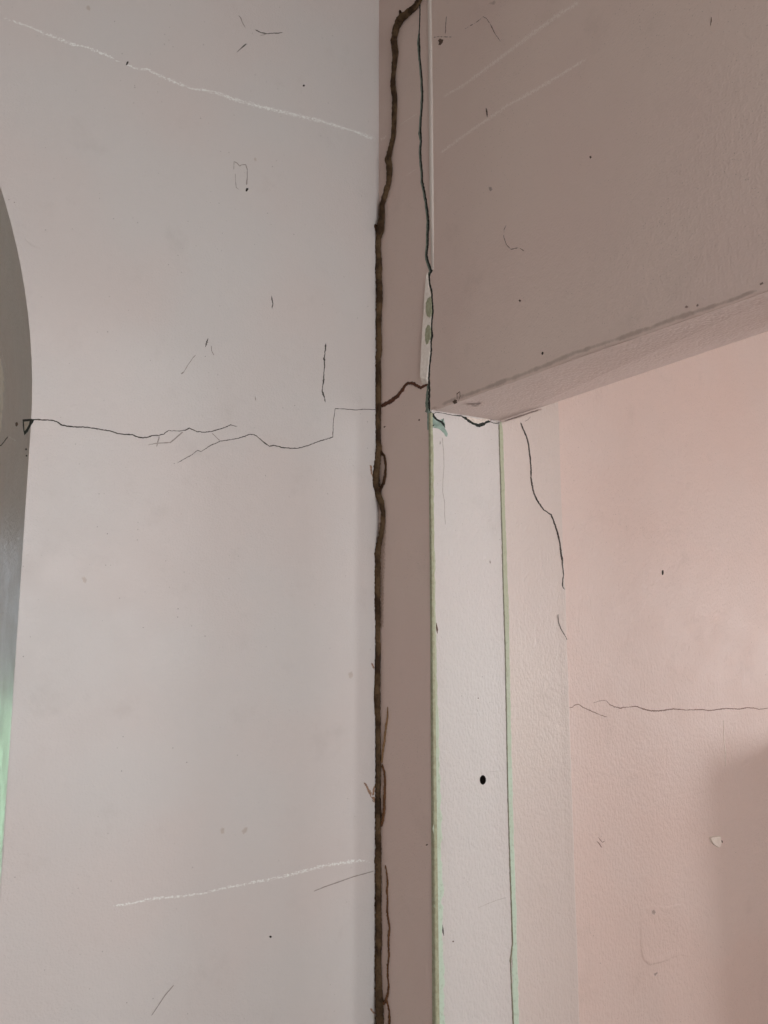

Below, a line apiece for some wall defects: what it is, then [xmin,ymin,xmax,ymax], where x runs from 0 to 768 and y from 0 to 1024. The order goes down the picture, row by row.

crack [417,5,564,589]
crack [34,339,376,462]
crack [570,700,767,717]